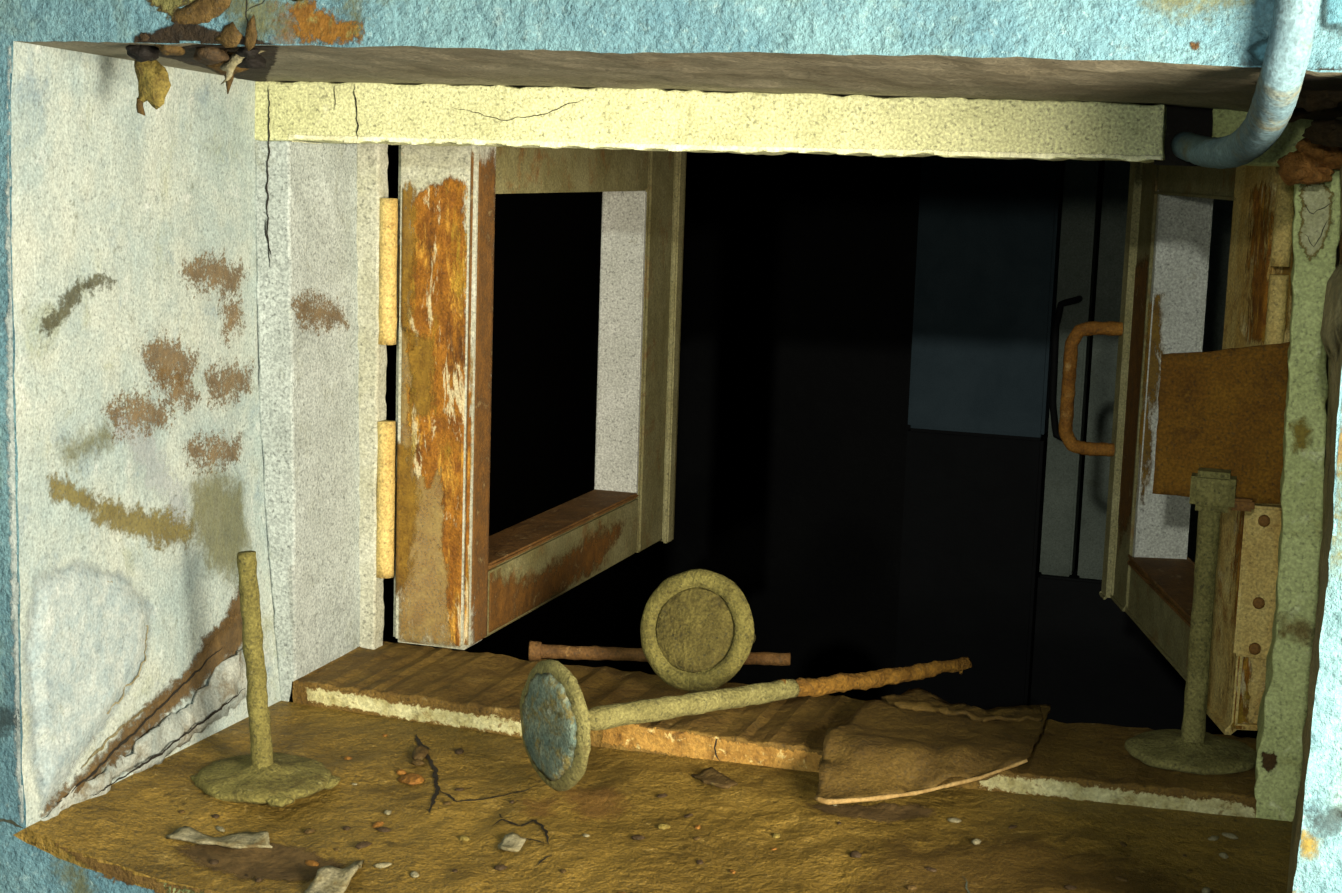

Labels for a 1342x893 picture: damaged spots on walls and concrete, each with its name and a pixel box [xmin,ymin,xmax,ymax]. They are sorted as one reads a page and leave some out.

spalling [126,0,279,116]
crack [264,85,272,267]
damp [40,273,117,336]
rust [395,150,624,647]
peeling [5,47,24,823]
peeling [40,648,247,821]
peeling [303,685,522,737]
peeling [601,724,822,789]
peeling [44,838,211,893]
peeling [166,826,272,849]
peeling [305,860,364,893]
peeling [498,832,526,852]